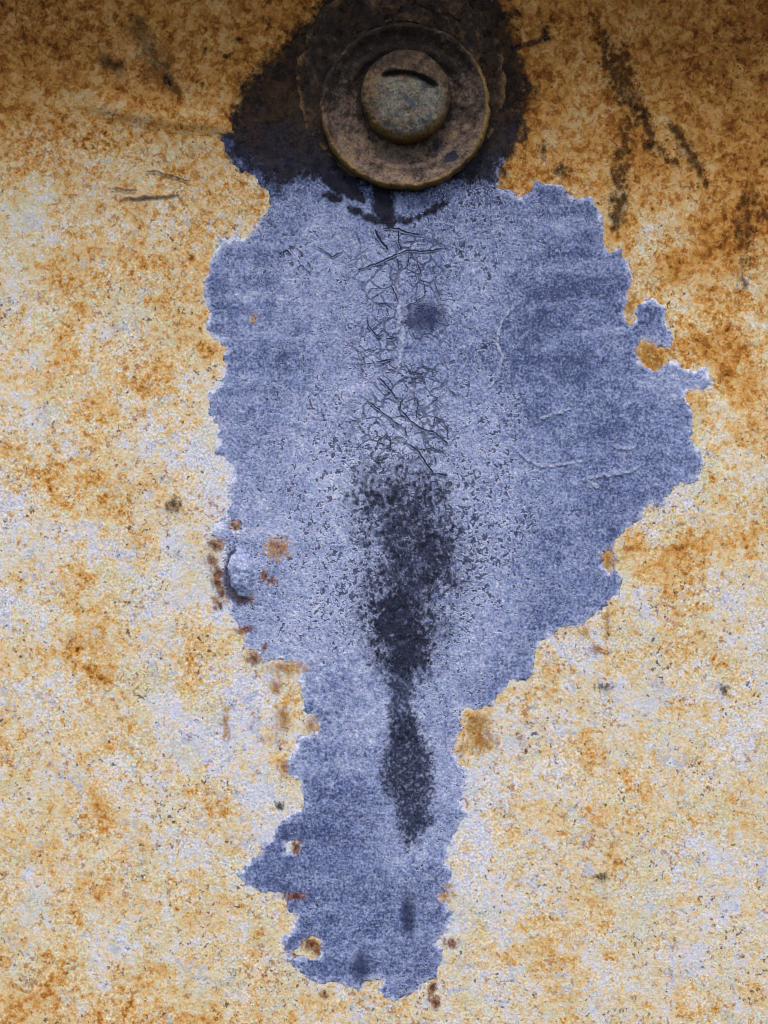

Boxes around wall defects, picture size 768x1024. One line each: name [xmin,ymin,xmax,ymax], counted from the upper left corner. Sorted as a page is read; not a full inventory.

rust [589,12,709,230]
damp [310,159,448,230]
rust [735,182,760,299]
crack [279,227,449,477]
rust [637,341,667,372]
rust [207,520,253,609]
rust [261,536,290,585]
rust [246,642,306,734]
damp [344,457,469,848]
rust [457,711,496,756]